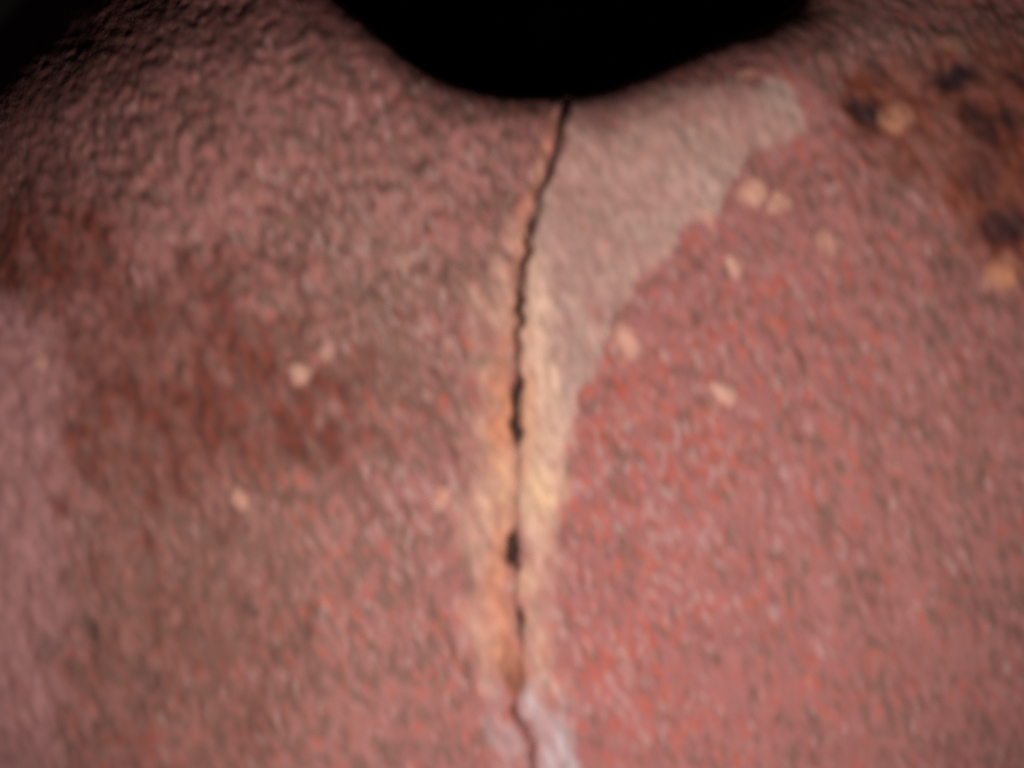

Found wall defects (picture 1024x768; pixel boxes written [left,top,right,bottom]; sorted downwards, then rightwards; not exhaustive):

peeling [731,173,795,219]
peeling [722,252,748,283]
peeling [604,317,645,370]
rust [471,104,576,698]
peeling [705,379,741,411]
crack [505,101,571,768]